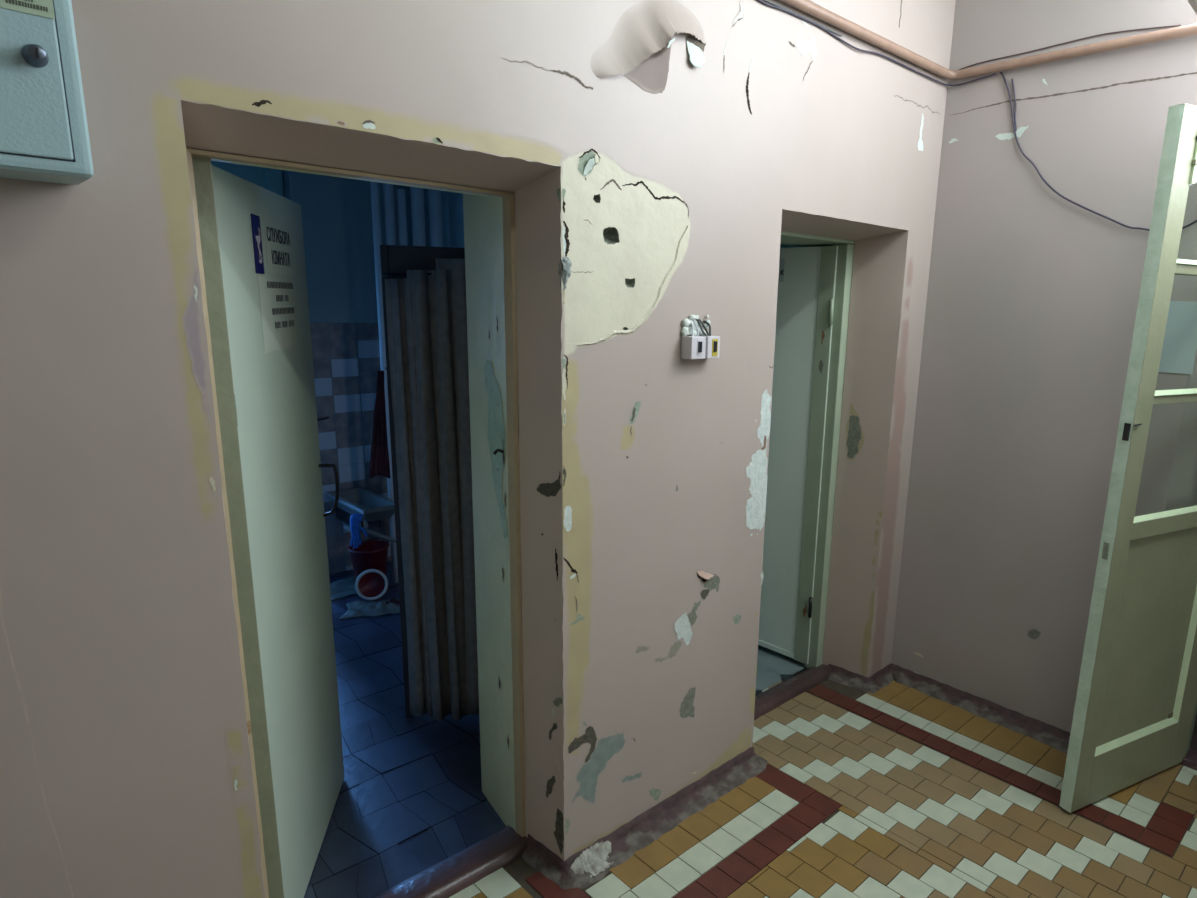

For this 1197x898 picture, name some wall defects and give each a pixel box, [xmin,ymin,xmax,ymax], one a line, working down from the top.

peeling [746,58,754,115]
flaking render [845,403,865,461]
peeling [147,71,764,861]